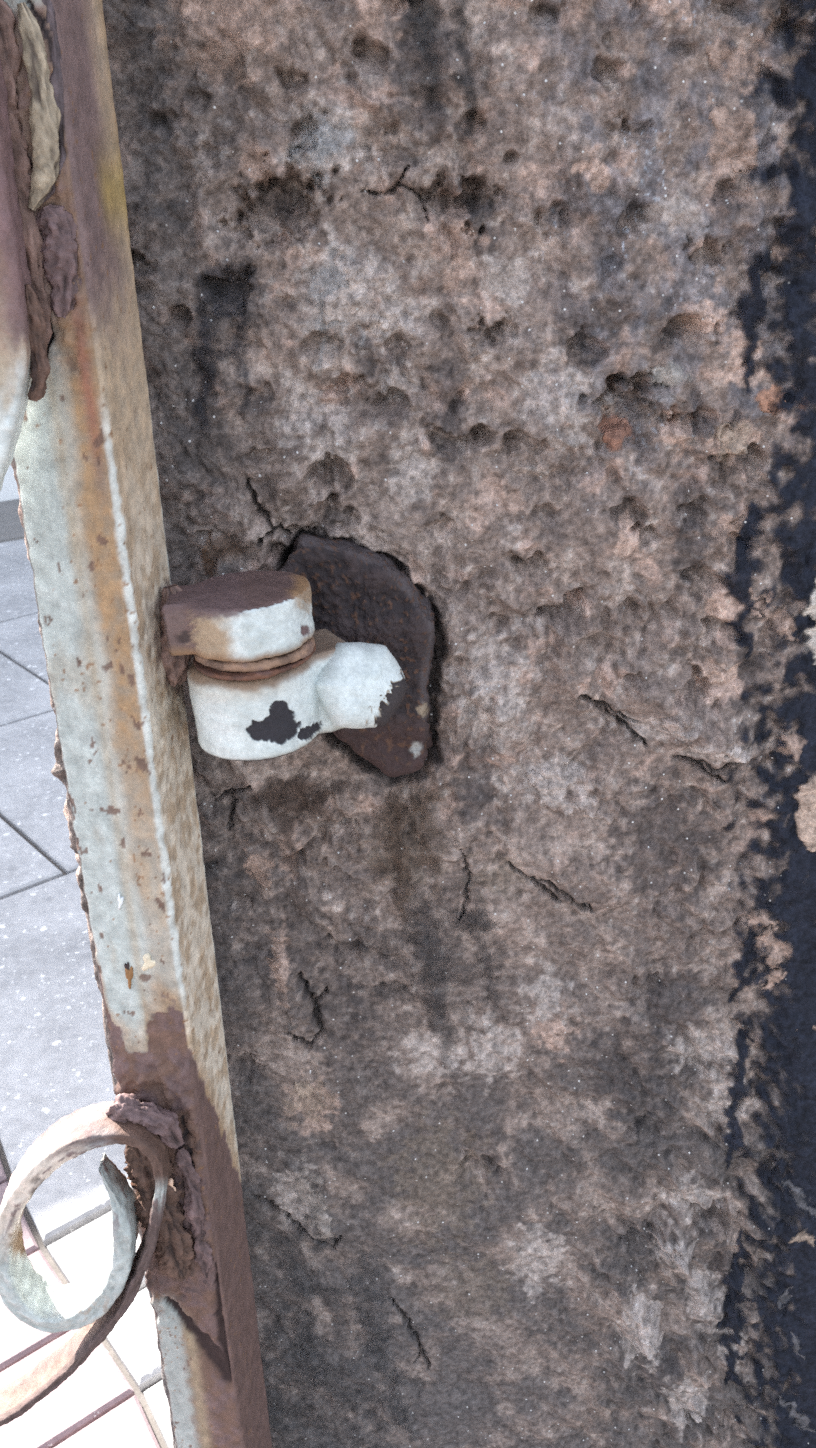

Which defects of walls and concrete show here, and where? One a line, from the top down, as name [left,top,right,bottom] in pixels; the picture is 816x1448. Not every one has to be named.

rust [17,0,89,402]
crack [588,696,644,741]
crack [294,981,323,1041]
rust [123,1145,213,1282]